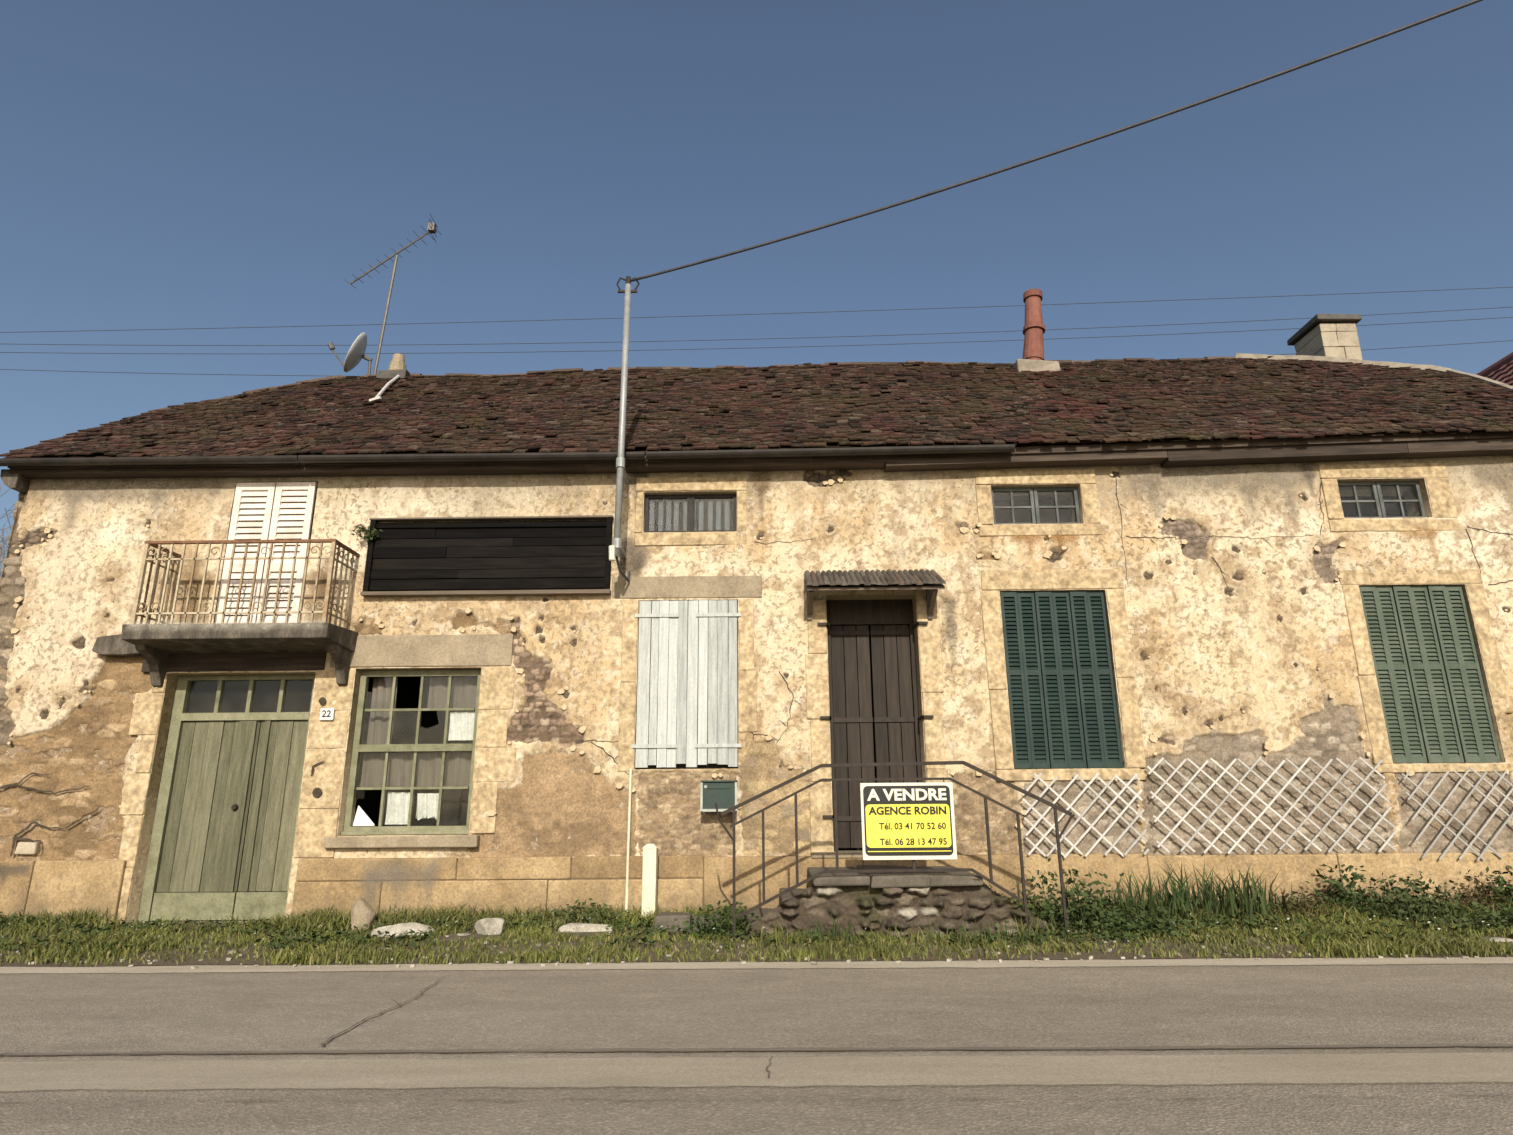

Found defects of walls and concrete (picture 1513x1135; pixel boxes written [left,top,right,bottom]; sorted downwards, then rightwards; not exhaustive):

flaking render [14,527,58,554]
flaking render [1143,513,1210,580]
flaking render [1313,539,1346,584]
crack [1466,526,1513,586]
flaking render [11,596,30,646]
spalling [39,681,97,719]
peeling [452,597,640,857]
flaking render [1149,730,1176,755]